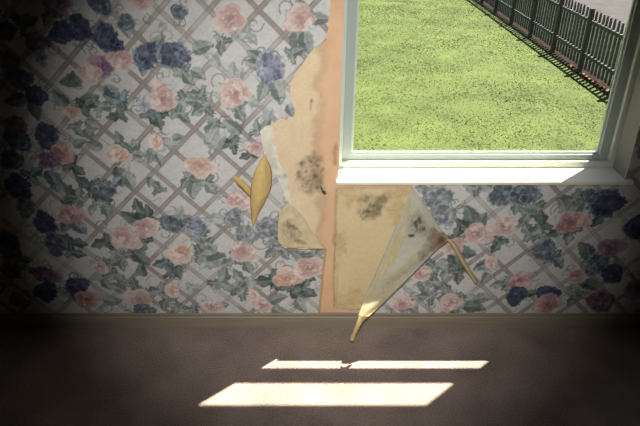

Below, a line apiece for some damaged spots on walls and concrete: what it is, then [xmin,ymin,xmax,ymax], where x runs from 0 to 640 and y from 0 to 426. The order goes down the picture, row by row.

peeling [265,46,326,238]
peeling [333,186,412,310]
damp [430,230,448,250]